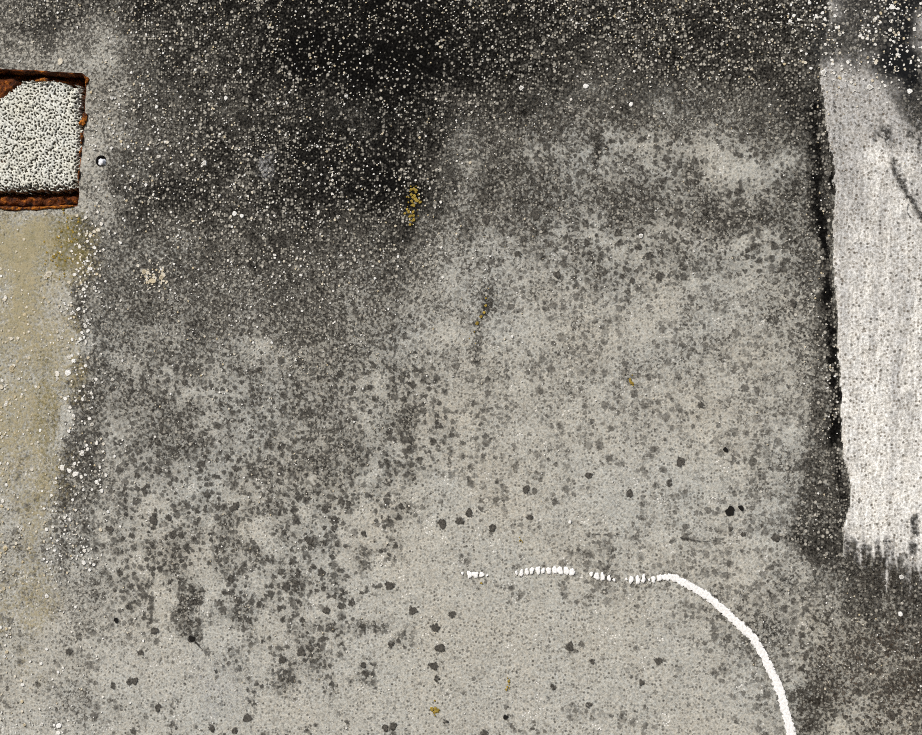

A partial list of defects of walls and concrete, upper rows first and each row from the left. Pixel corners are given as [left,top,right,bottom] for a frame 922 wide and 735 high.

water stain [0,0,922,586]
crack [828,145,836,195]
water stain [786,99,922,735]